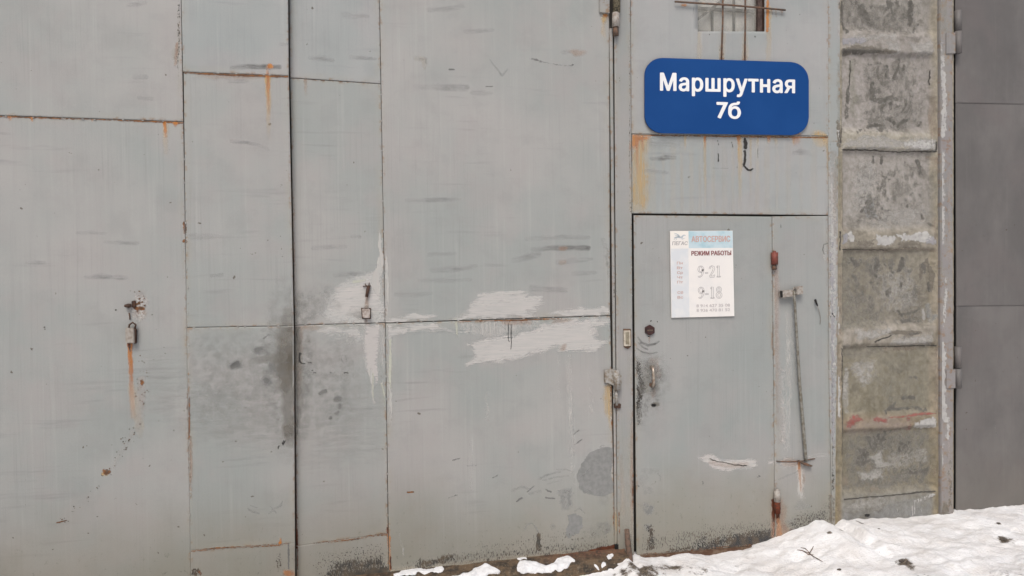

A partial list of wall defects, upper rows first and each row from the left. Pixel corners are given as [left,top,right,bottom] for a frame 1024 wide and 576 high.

rust [177,4,291,94]
rust [0,116,183,133]
rust [632,132,828,206]
rust [771,499,792,538]